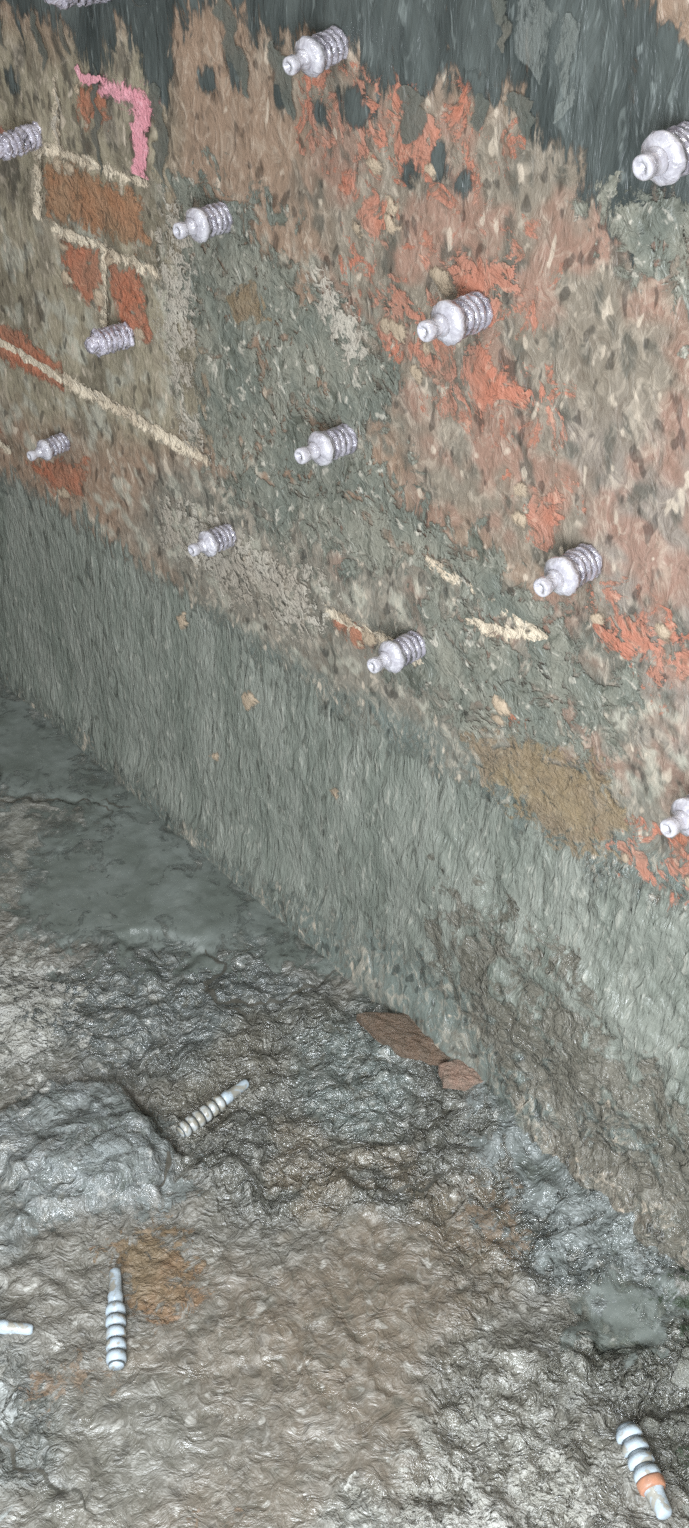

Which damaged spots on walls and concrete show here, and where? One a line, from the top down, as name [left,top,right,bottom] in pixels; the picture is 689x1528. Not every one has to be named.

spalling [72,80,111,132]
spalling [42,156,152,344]
spalling [295,62,576,454]
spalling [0,325,64,392]
spalling [24,454,91,498]
spalling [502,468,587,553]
peeling [176,612,189,629]
spalling [333,614,377,658]
spalling [573,576,689,715]
peeling [241,691,259,711]
spalling [491,694,527,732]
spalling [605,815,689,912]